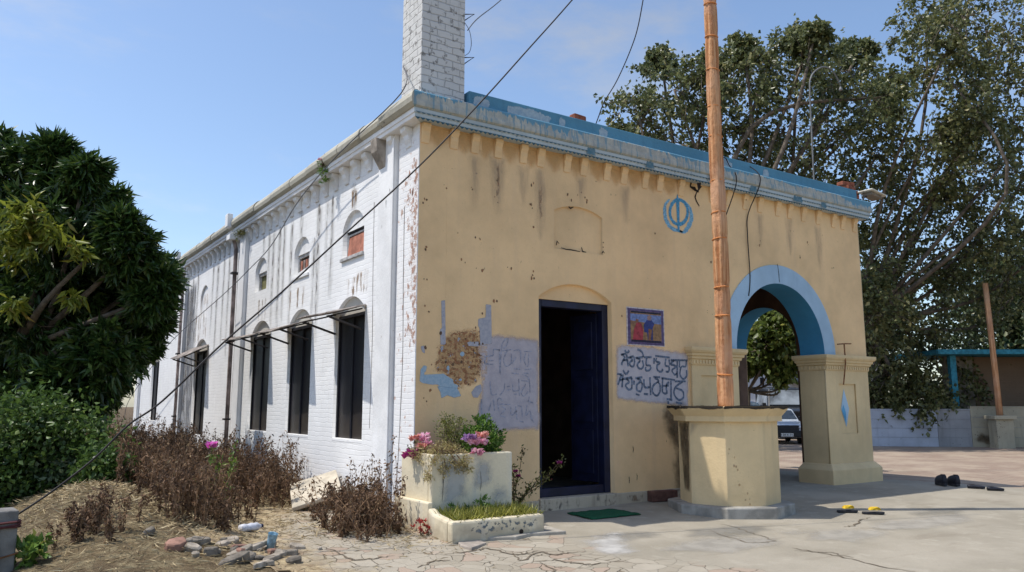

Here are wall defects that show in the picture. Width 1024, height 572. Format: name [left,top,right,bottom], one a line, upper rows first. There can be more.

peeling [399,158,498,402]